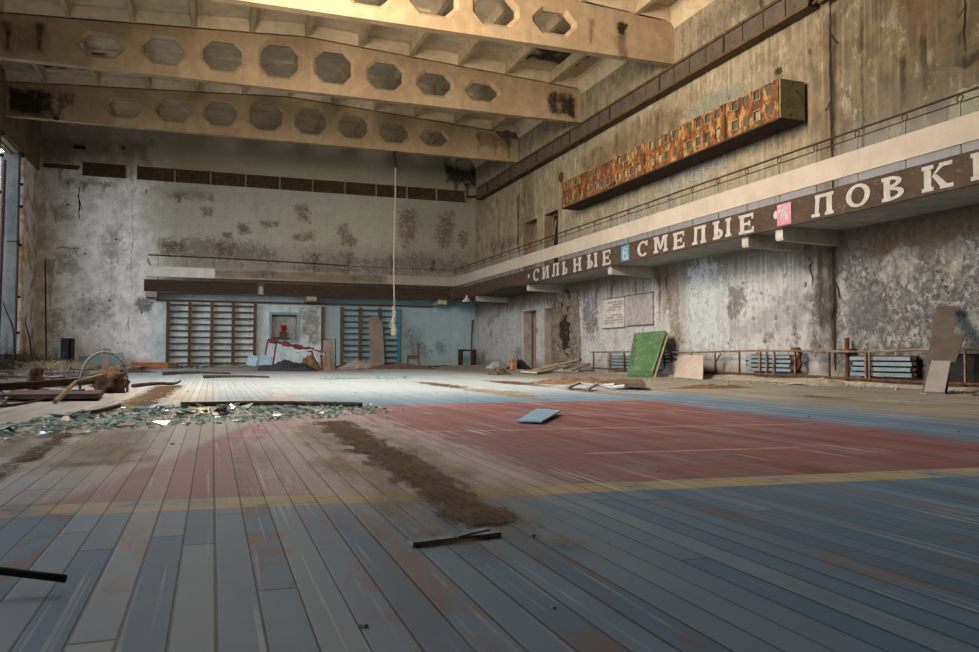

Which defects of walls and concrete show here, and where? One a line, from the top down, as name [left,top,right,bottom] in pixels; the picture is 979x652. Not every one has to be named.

leakage [8,87,57,117]
leakage [547,93,575,118]
leakage [444,162,476,187]
spalling [559,305,571,356]
peeling [583,295,598,341]
peeling [673,255,746,358]